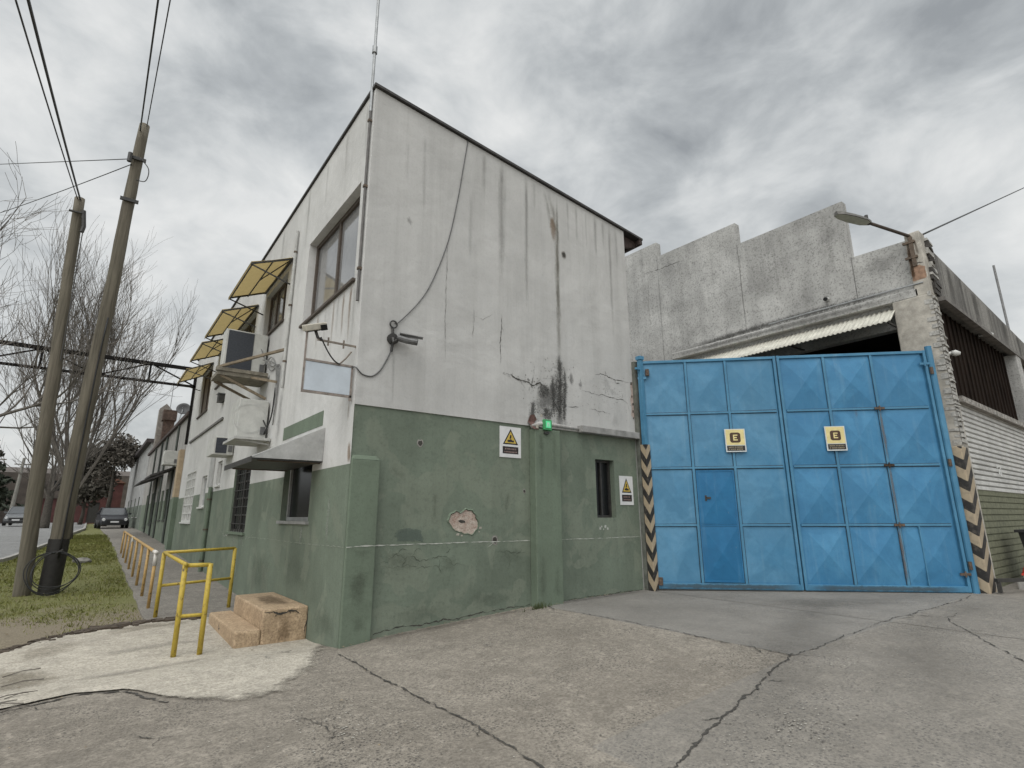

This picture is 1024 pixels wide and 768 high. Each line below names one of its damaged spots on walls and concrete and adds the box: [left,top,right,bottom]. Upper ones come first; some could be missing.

leakage [516,359,579,424]
spalling [446,508,482,536]
crack [218,610,545,768]
crack [373,589,1023,768]